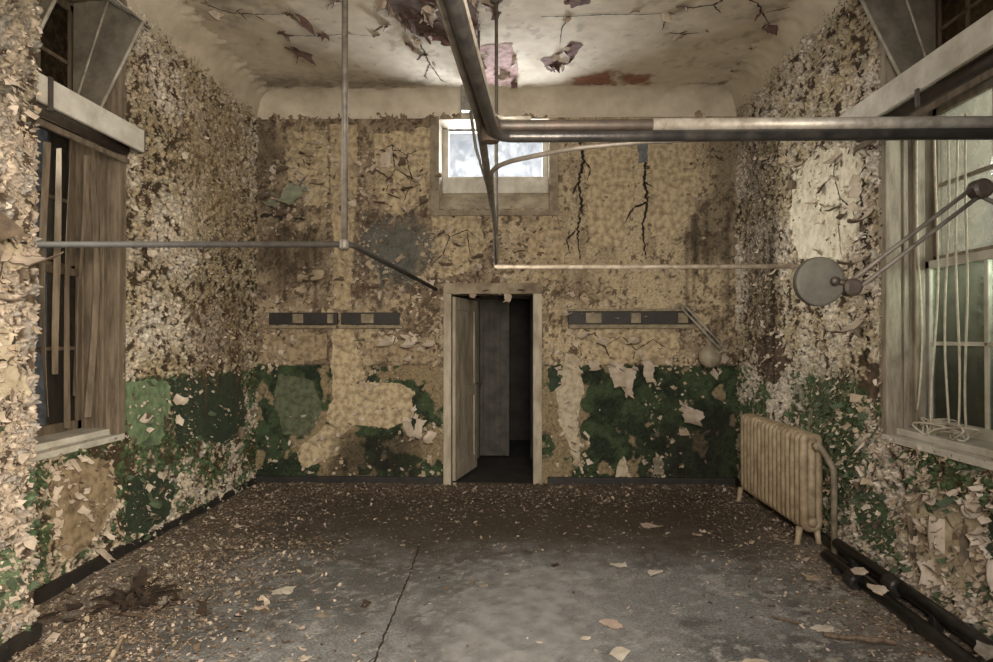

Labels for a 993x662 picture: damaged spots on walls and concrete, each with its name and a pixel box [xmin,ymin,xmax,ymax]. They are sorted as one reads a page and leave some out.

crack [541,0,723,42]
crack [749,0,789,25]
peeling [740,0,878,117]
crack [566,142,591,259]
crack [626,162,652,259]
peeling [0,0,646,640]
peeling [543,141,993,637]
crack [369,541,421,662]